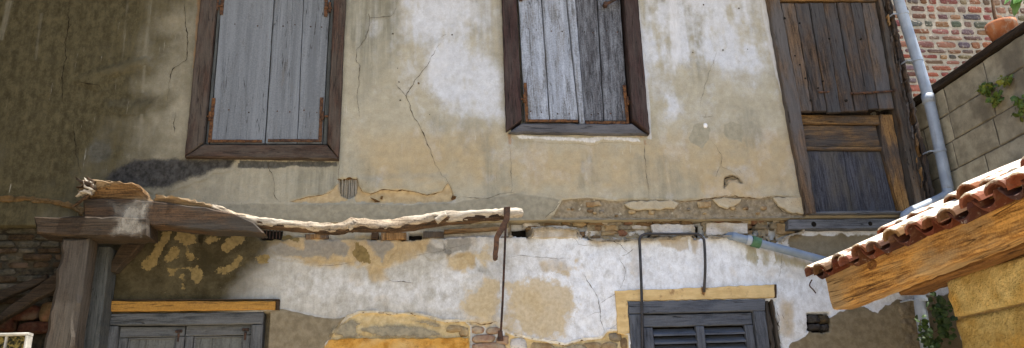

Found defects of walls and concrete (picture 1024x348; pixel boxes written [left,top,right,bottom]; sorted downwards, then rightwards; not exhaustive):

damp [0,0,17,43]
damp [94,0,164,156]
crack [356,3,397,108]
crack [268,34,512,202]
spalling [133,176,809,348]
crack [514,239,633,346]
spalling [806,314,830,333]
spalling [895,297,934,348]